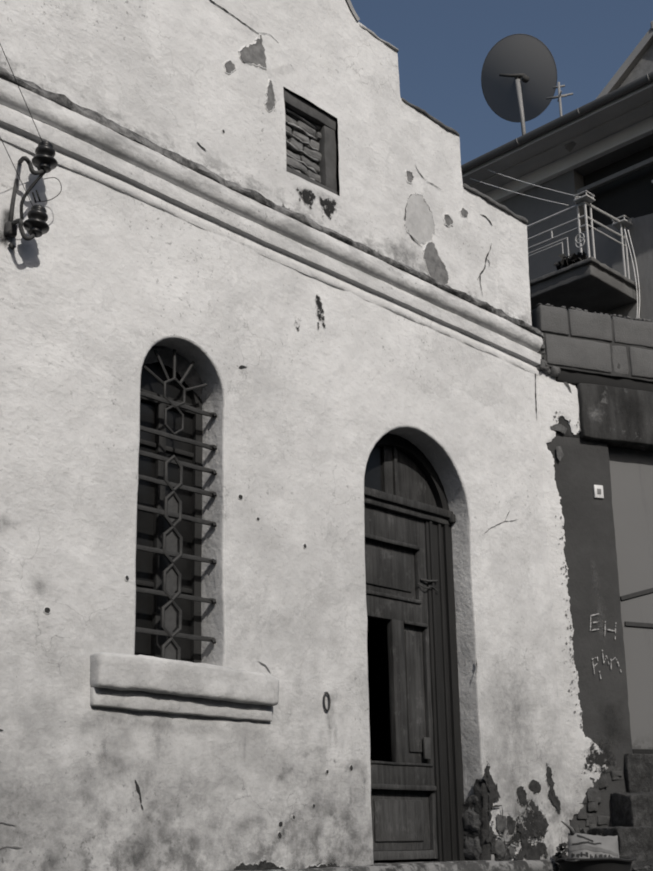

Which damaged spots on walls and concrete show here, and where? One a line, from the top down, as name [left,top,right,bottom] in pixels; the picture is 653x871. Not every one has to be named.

crack [210,0,278,43]
peeling [223,34,276,113]
peeling [404,169,468,285]
crack [478,214,493,295]
spalling [462,763,561,861]
spalling [233,859,288,870]